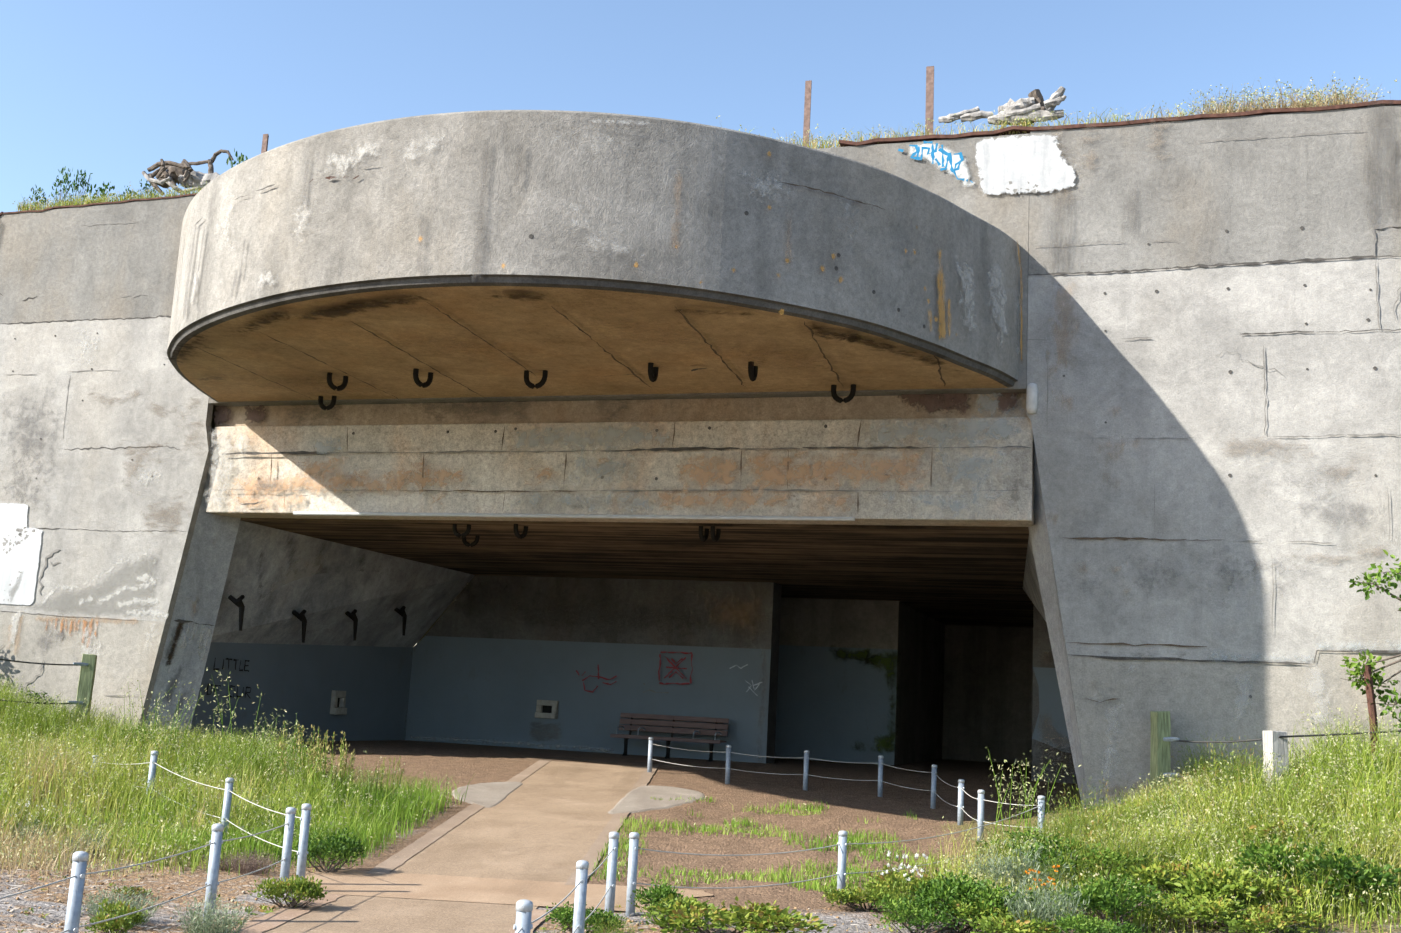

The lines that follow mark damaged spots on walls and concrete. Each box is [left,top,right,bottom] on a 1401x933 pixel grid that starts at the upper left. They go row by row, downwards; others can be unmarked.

corrosion [235,458,404,507]
water stain [42,574,211,665]